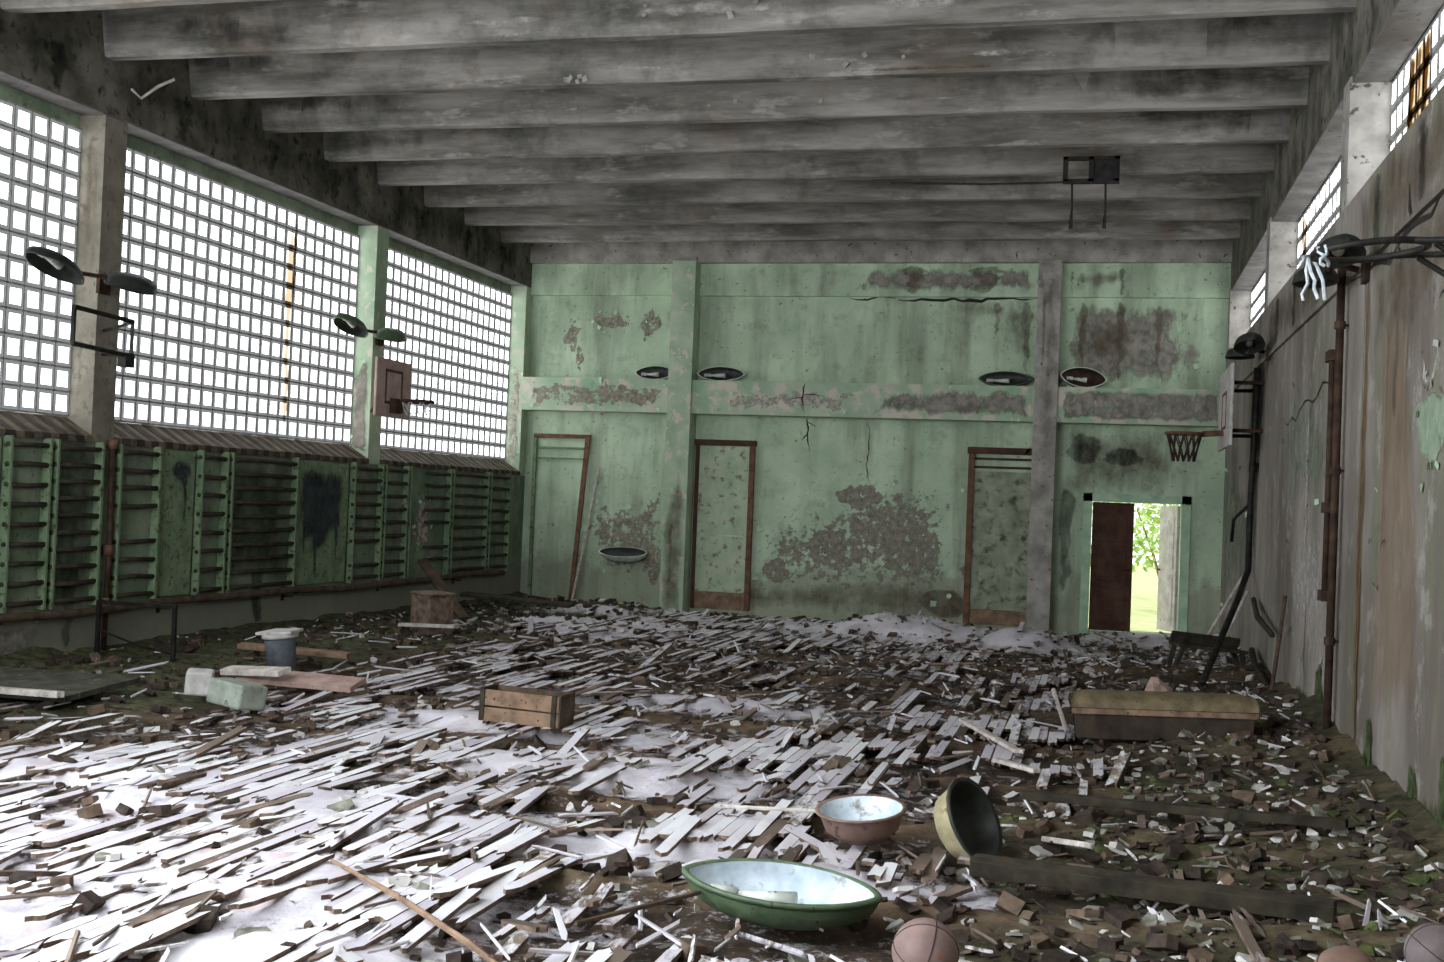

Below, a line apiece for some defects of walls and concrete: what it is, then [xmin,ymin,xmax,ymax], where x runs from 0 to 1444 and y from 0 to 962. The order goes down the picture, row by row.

rust [1406,30,1431,131]
peeling [504,310,666,459]
peeling [717,385,1028,422]
peeling [1060,298,1220,424]
peeling [1415,339,1444,492]
peeling [751,470,965,607]